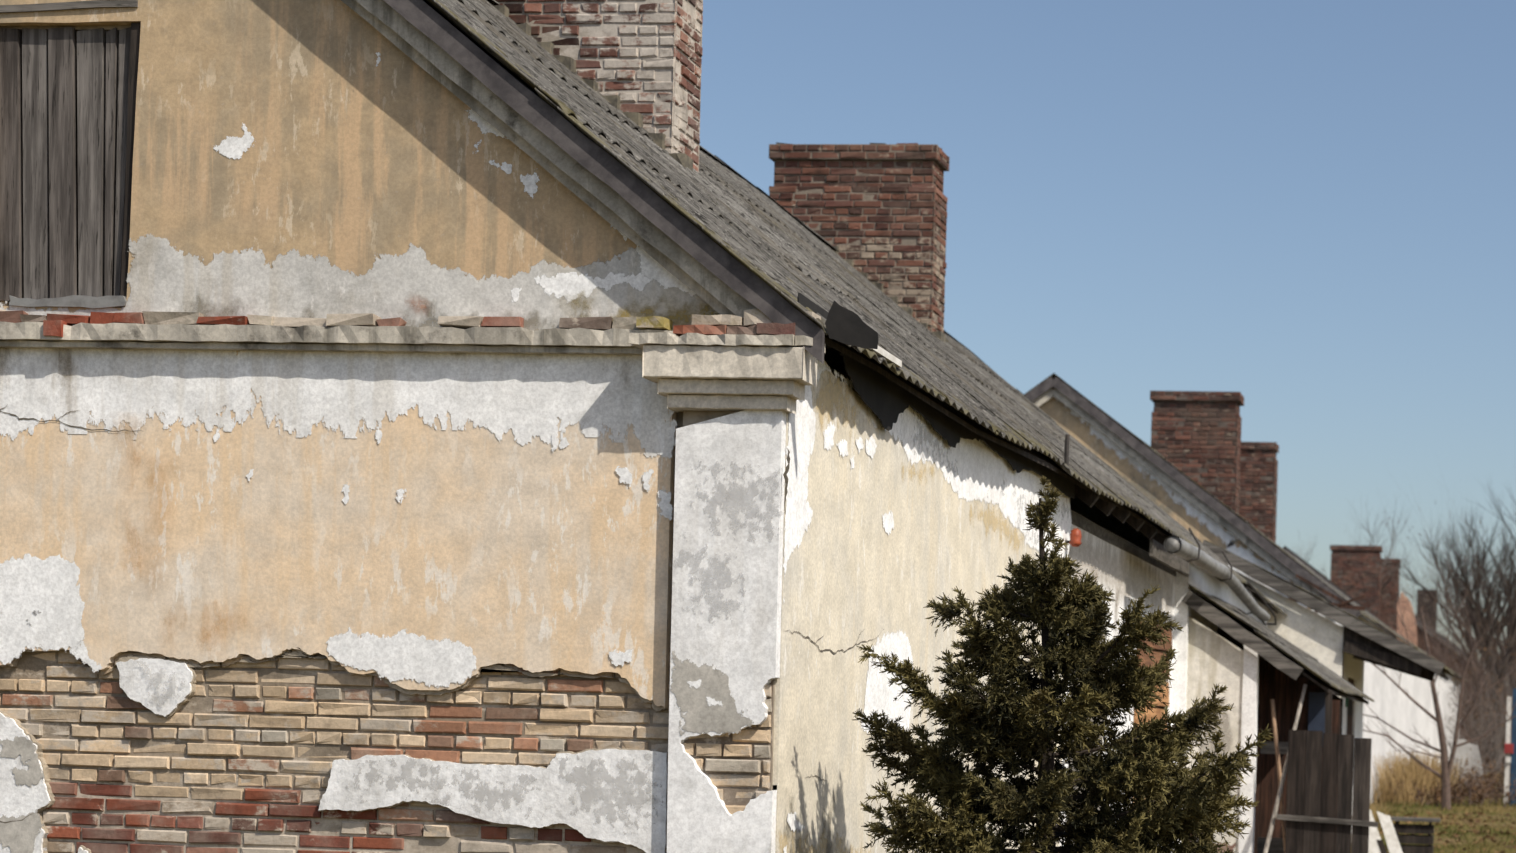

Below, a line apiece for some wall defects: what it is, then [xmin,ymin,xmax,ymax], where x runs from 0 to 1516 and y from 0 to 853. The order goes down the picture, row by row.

peeling [0,225,717,337]
crack [0,405,141,432]
peeling [0,348,740,520]
peeling [783,360,1072,578]
crack [785,629,884,654]
flaking render [0,553,775,853]
peeling [783,812,805,853]